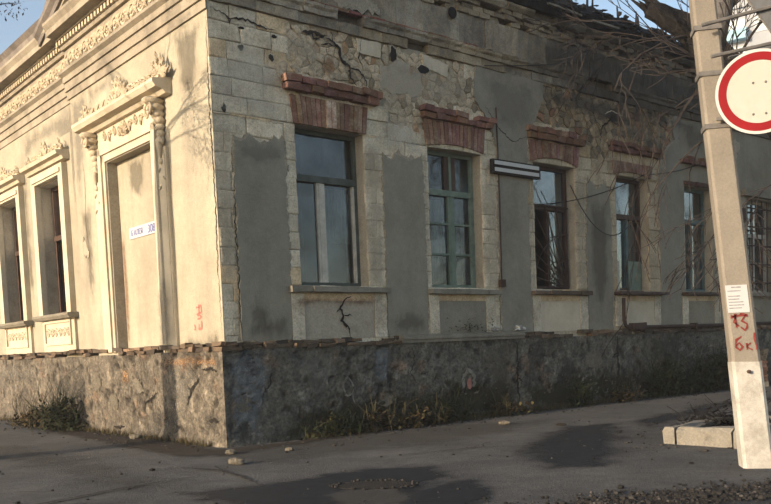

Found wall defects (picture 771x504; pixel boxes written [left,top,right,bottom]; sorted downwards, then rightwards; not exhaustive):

crack [302,30,367,86]
spalling [268,21,484,133]
spalling [535,82,673,161]
crack [337,296,351,337]